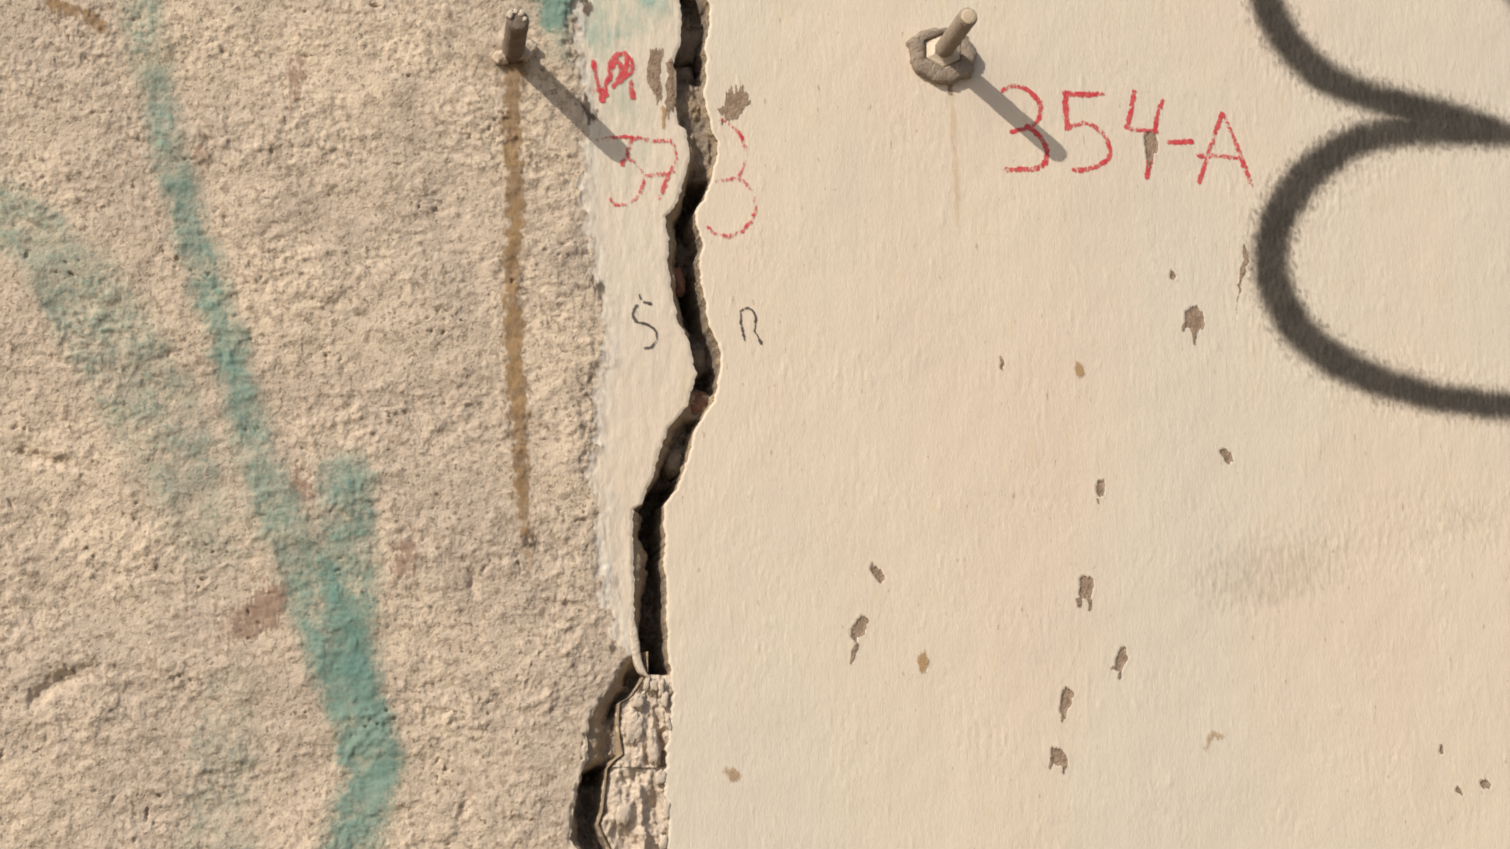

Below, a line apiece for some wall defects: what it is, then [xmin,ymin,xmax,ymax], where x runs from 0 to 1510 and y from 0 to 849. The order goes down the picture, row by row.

rust [501,60,532,536]
peeling [1182,305,1204,344]
crack [561,0,719,849]
peeling [1075,575,1093,611]
peeling [850,615,869,664]
peeling [1110,646,1128,679]
peeling [1060,687,1074,722]
spalling [597,674,674,849]
peeling [1048,747,1068,774]